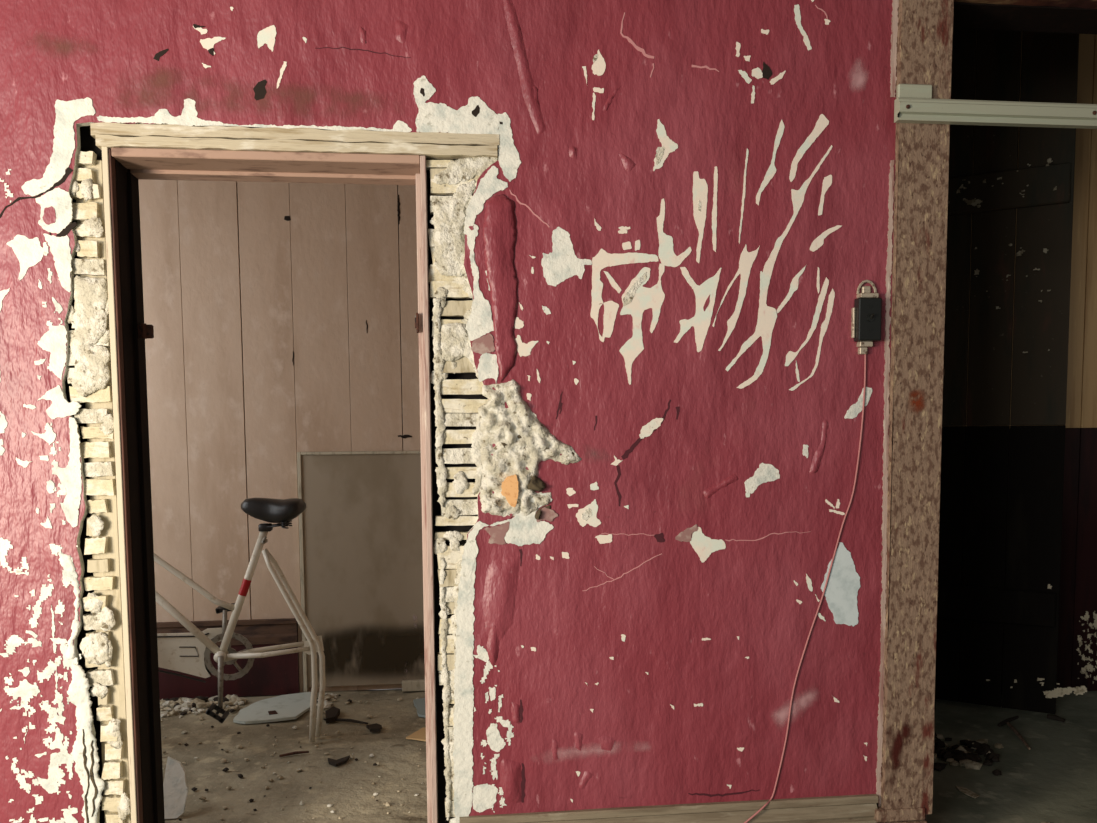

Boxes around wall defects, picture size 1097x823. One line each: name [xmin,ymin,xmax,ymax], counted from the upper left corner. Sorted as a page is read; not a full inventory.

peeling [653,119,678,171]
crack [0,167,73,218]
crack [49,222,77,237]
crack [555,393,563,419]
flaking render [0,76,612,823]
crack [614,400,679,506]
peeling [825,499,845,515]
crack [582,533,662,591]
flaking render [794,542,861,626]
peeling [1037,611,1097,698]